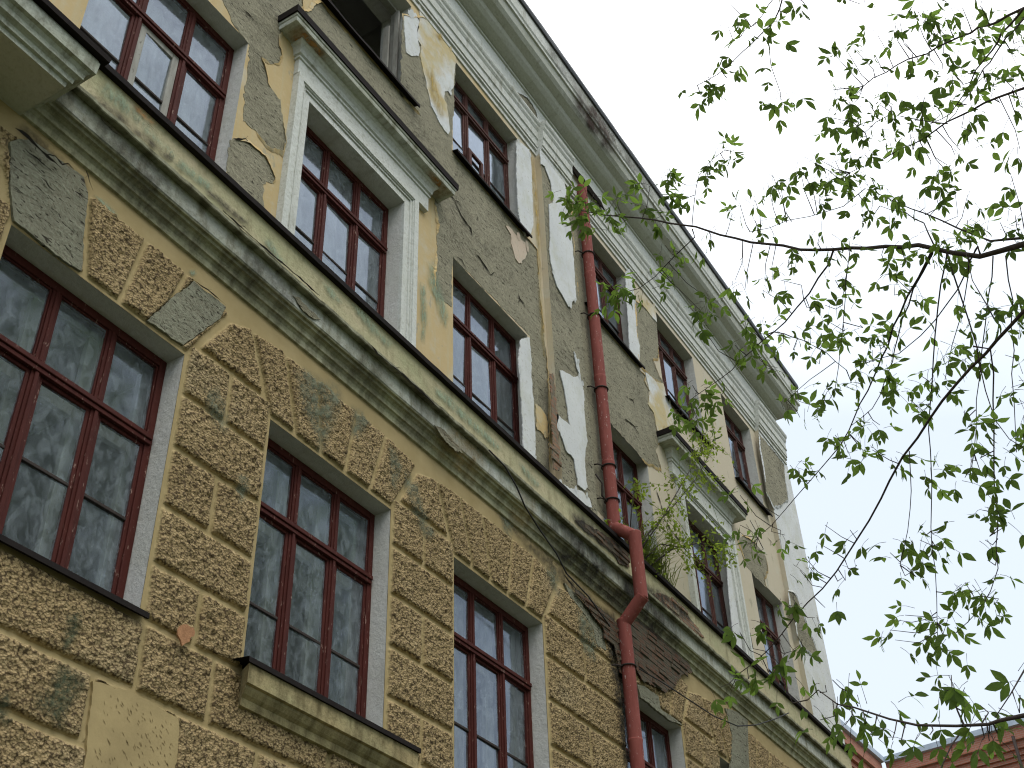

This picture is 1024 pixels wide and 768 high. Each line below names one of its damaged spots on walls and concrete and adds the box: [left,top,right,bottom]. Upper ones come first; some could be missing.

peeling [223,0,675,519]
peeling [758,433,789,509]
spalling [574,520,630,567]
spalling [177,624,195,646]
spalling [575,588,693,693]
spalling [652,593,704,638]